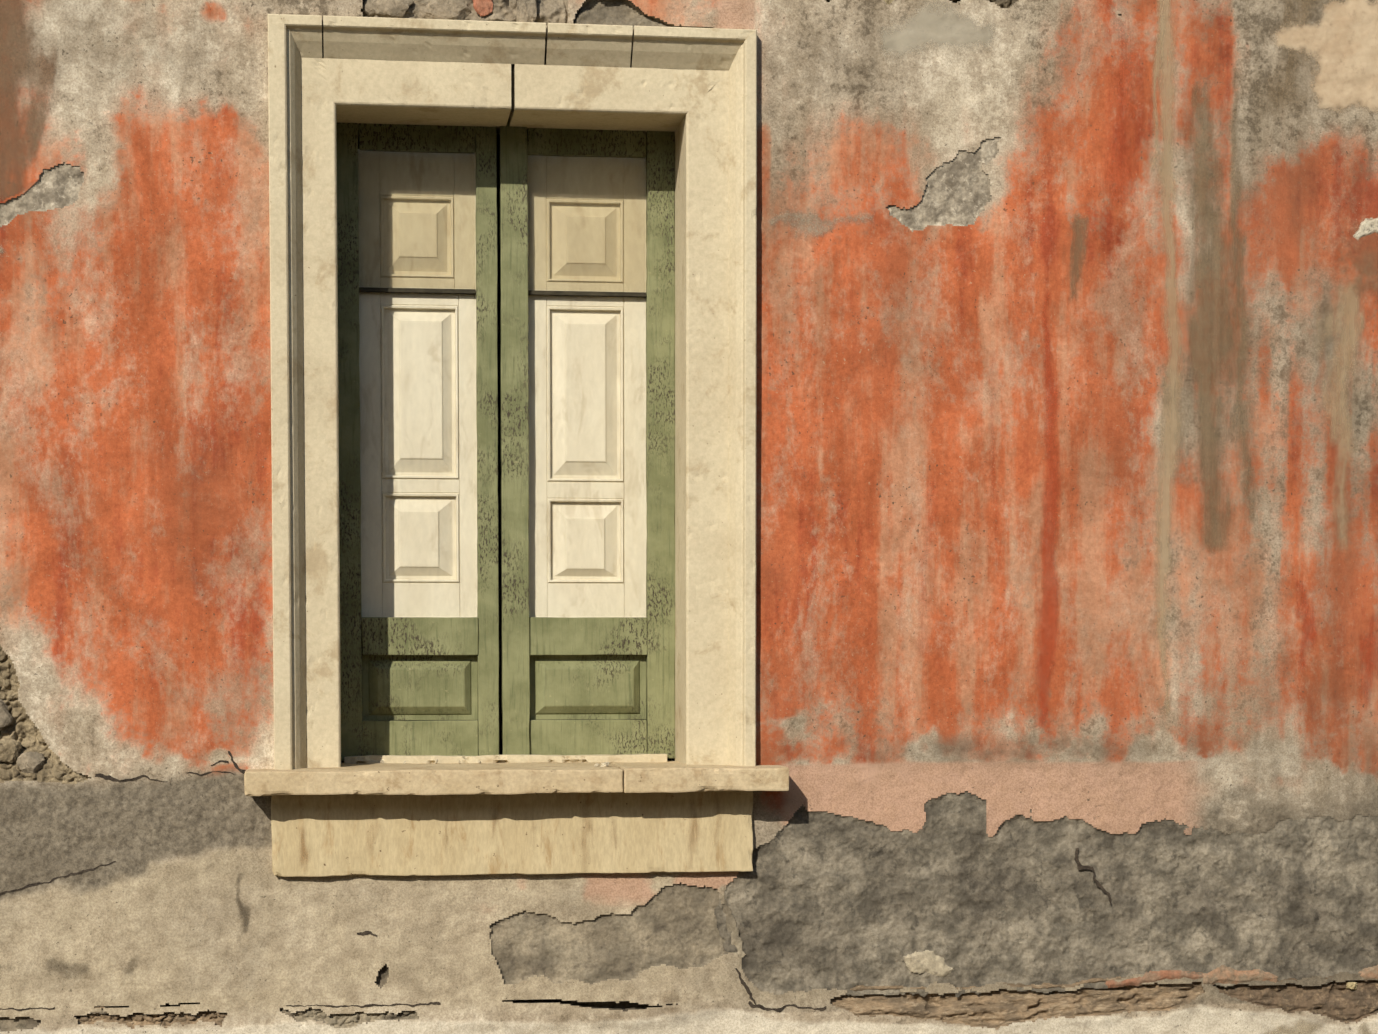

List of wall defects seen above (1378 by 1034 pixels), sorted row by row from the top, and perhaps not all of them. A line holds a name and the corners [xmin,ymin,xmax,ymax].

flaking render [361,0,713,28]
flaking render [988,0,1019,8]
peeling [0,162,84,227]
peeling [886,137,1001,232]
leakage [1154,0,1250,661]
flaking render [0,645,91,784]
flaking render [489,791,1378,1030]
crack [0,1005,55,1013]
crack [91,1002,200,1014]
crack [286,1001,440,1009]
crack [502,999,678,1012]
crack [735,968,826,1012]